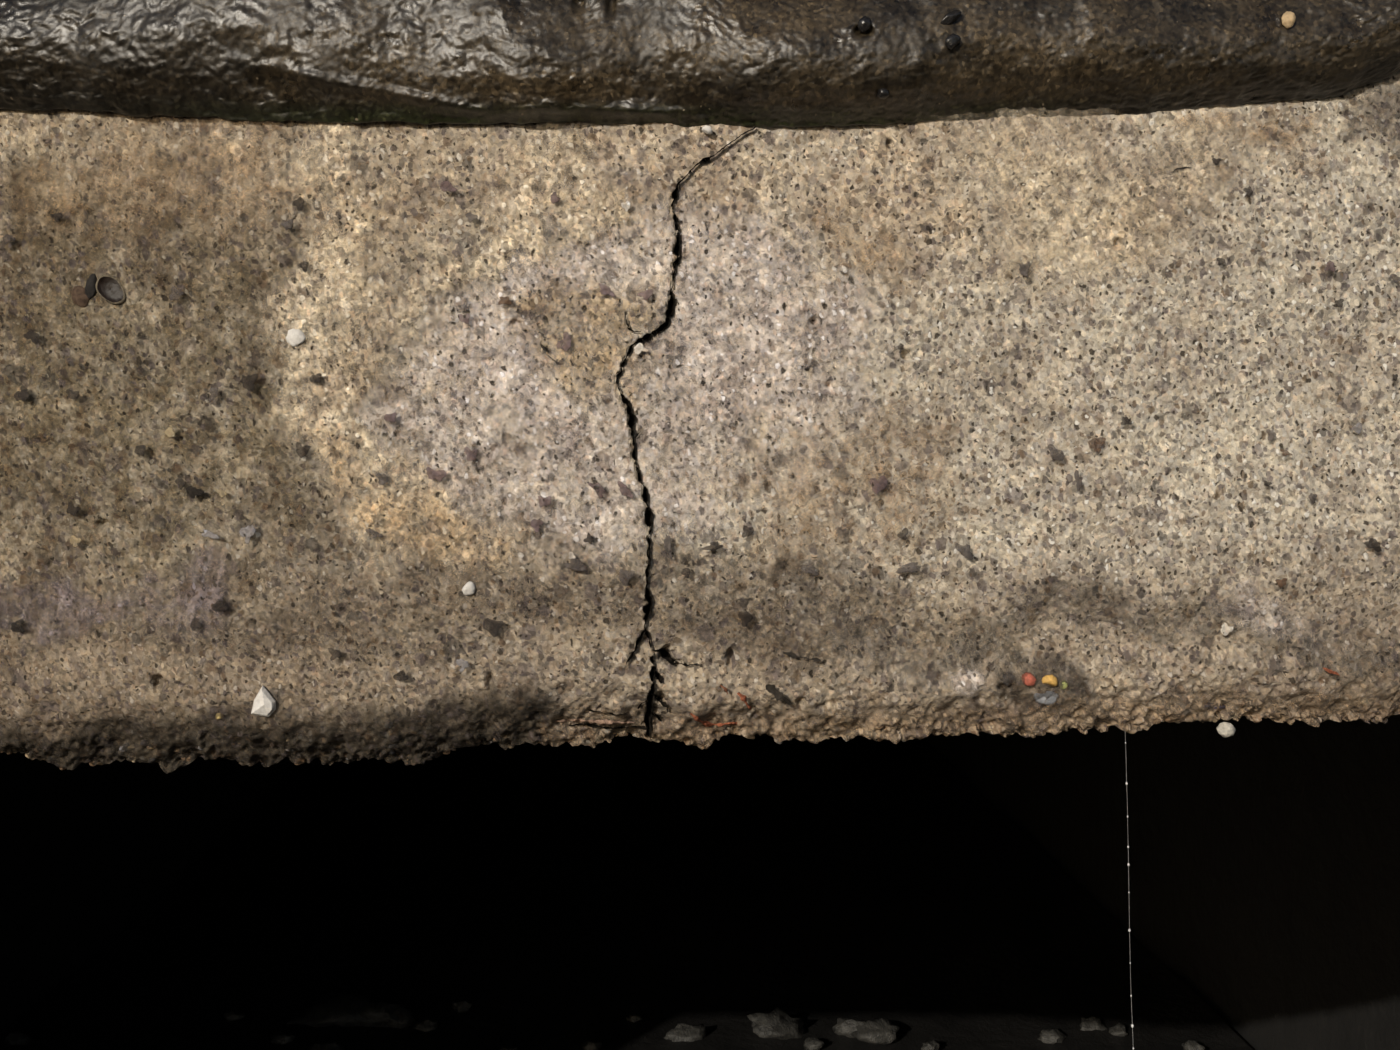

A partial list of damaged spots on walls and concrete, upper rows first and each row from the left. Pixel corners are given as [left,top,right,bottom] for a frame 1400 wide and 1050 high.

crack [569,126,756,736]